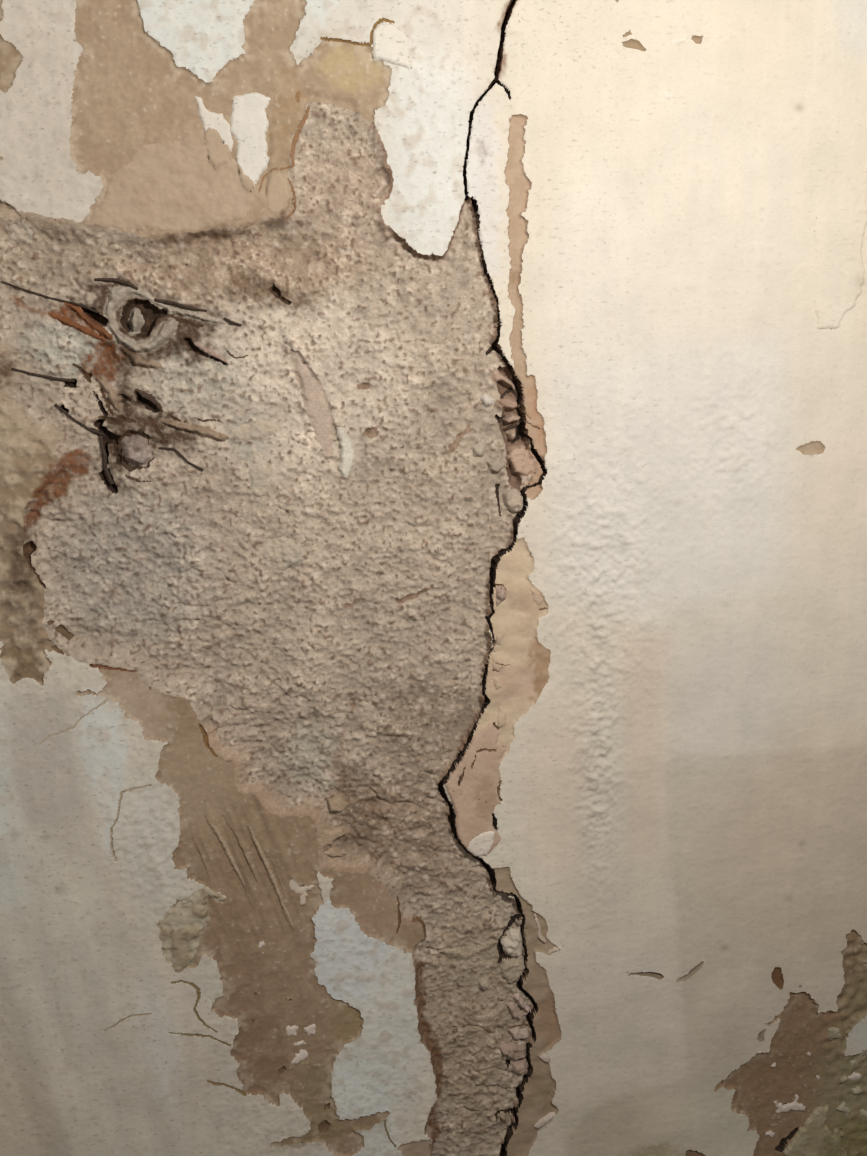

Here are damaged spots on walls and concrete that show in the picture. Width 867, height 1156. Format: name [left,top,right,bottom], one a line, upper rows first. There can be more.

peeling [622,31,647,51]
rust [50,304,126,381]
rust [25,449,89,529]
flaking render [0,0,562,1156]
crack [437,0,547,1156]
peeling [714,930,867,1156]